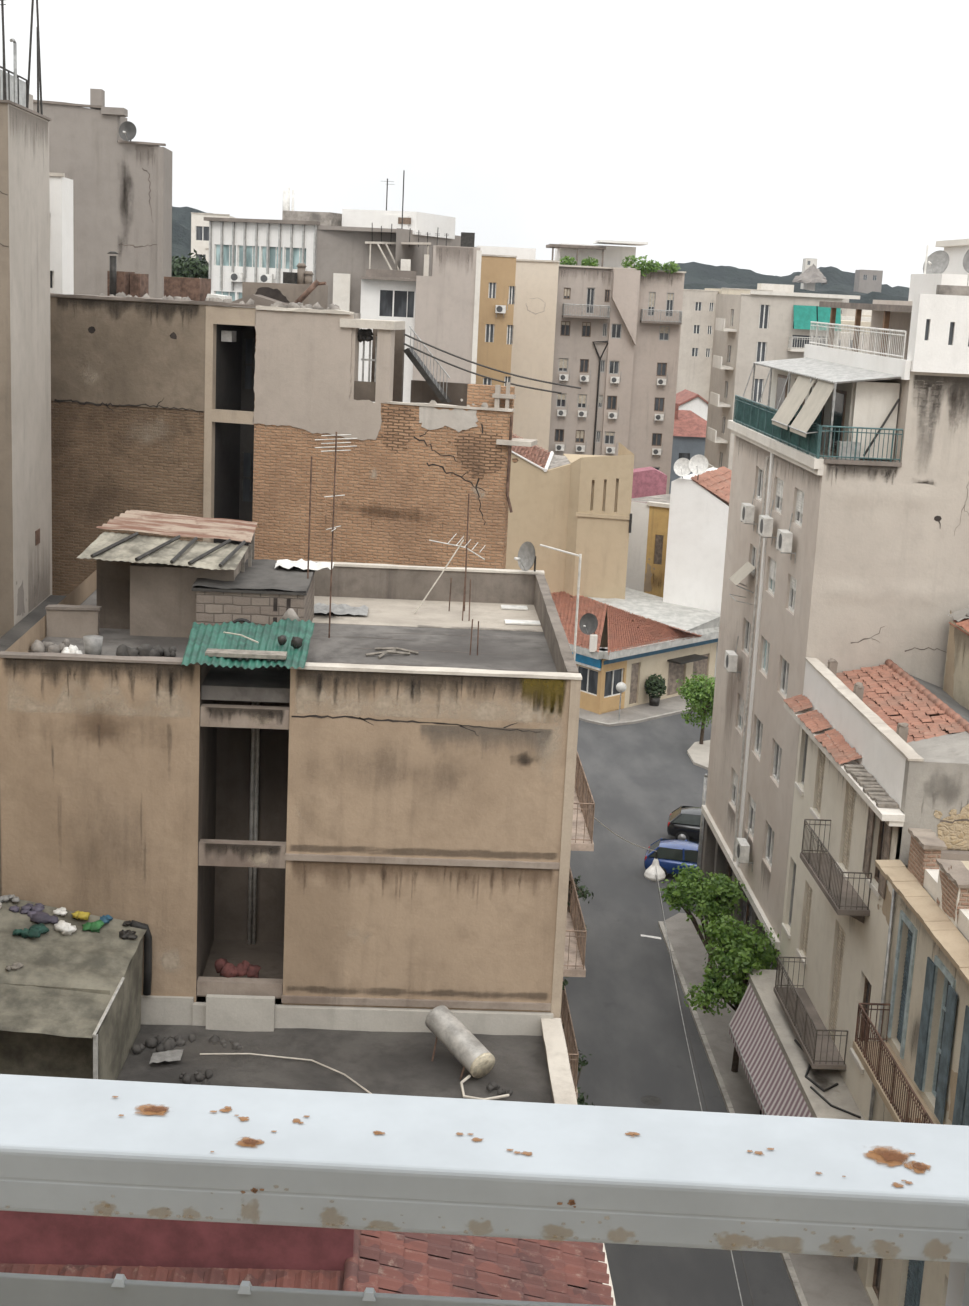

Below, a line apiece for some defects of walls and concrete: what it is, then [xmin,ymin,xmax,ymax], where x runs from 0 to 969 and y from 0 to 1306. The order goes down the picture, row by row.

damp [914,375,969,413]
spalling [378,404,422,454]
crack [414,432,486,525]
spalling [448,430,519,480]
damp [5,658,194,715]
damp [207,669,543,723]
crack [292,715,538,736]
corrosion [119,1104,168,1116]
corrosion [236,1130,276,1147]
corrosion [865,1147,931,1188]